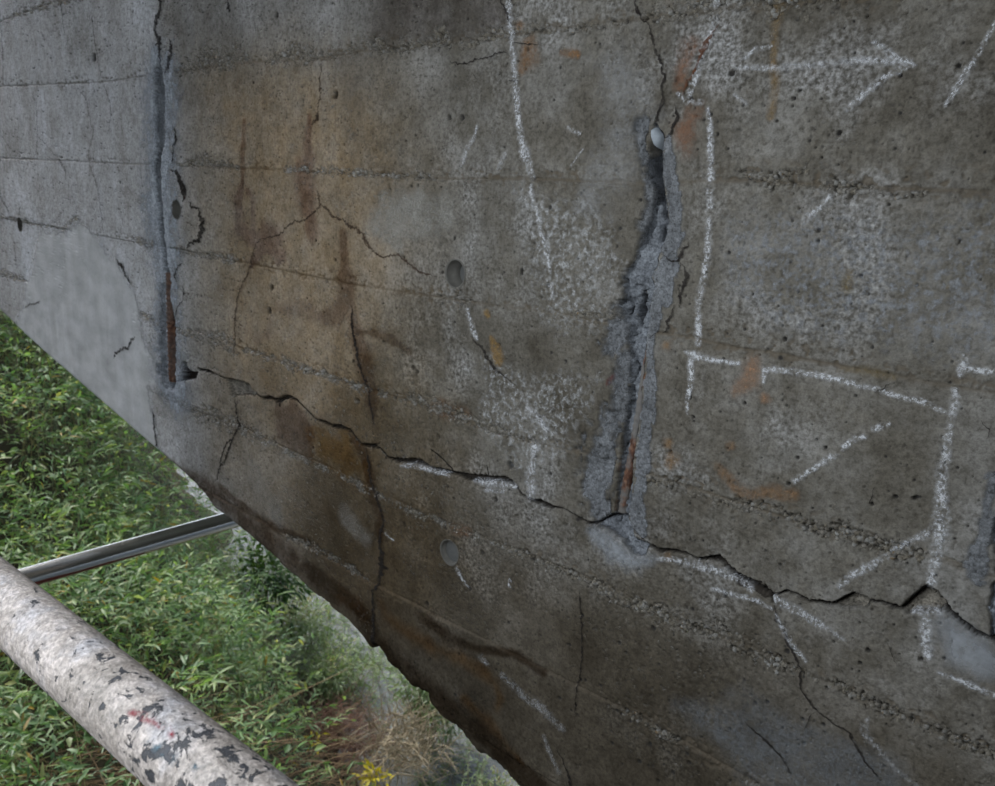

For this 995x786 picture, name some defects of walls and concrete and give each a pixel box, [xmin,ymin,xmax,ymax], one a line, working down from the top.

crack [153,0,172,73]
crack [310,66,322,128]
crack [200,188,624,645]
spalling [581,116,685,555]
spalling [963,472,995,635]
crack [574,593,583,712]
crack [651,544,995,781]